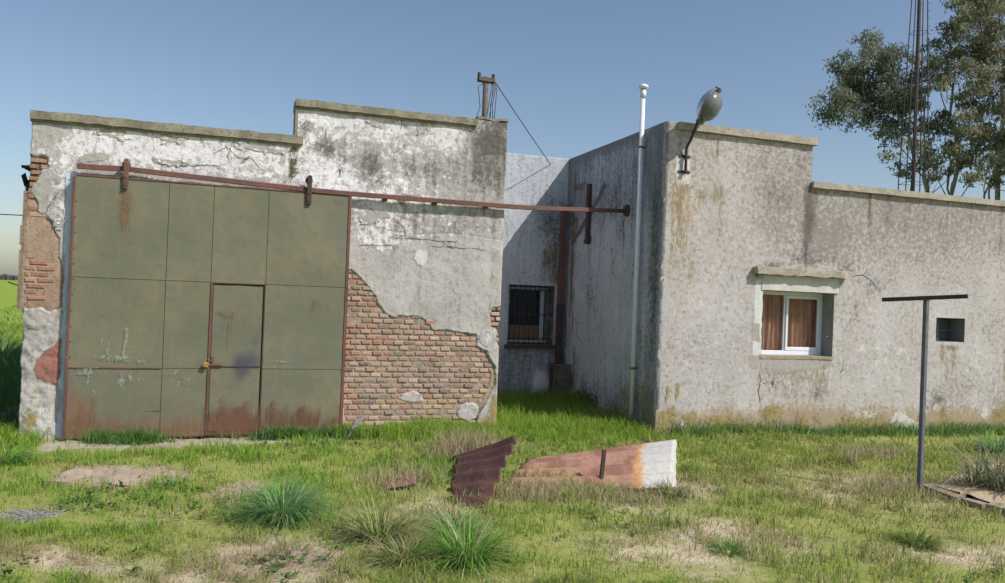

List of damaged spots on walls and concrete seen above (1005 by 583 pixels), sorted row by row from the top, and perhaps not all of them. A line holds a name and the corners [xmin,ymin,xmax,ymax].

peeling [97,128,126,141]
peeling [152,155,189,167]
peeling [160,134,184,145]
peeling [226,141,285,155]
damp [288,147,300,180]
damp [360,153,384,183]
damp [472,121,508,198]
flaking render [17,154,66,314]
flaking render [343,270,500,429]
rust [203,396,341,438]